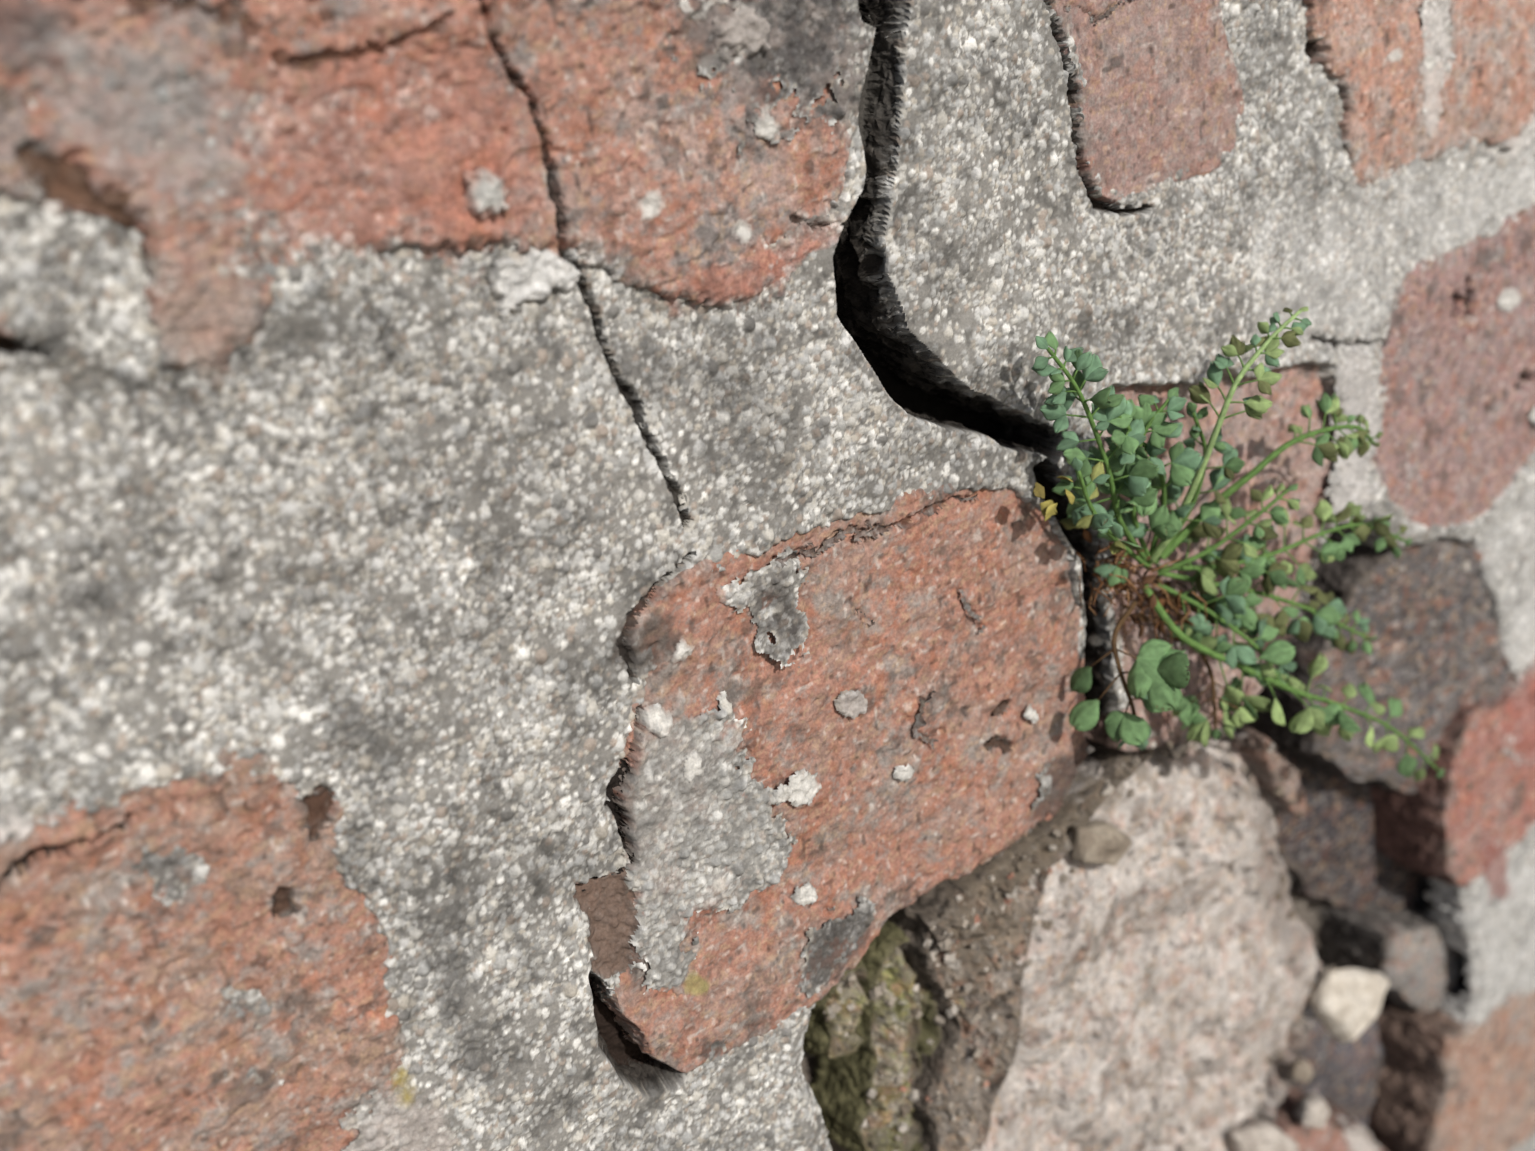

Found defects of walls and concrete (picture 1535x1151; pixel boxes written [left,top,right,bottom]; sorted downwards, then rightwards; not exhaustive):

spalling [16,148,138,229]
spalling [194,0,559,295]
spalling [663,211,850,325]
crack [775,0,1108,707]
crack [127,0,692,891]
spalling [984,737,1012,754]
spalling [992,700,1009,717]
crack [3,813,130,877]
spalling [303,784,334,842]
spalling [272,887,300,919]
spalling [573,867,640,979]
crack [589,982,662,1069]